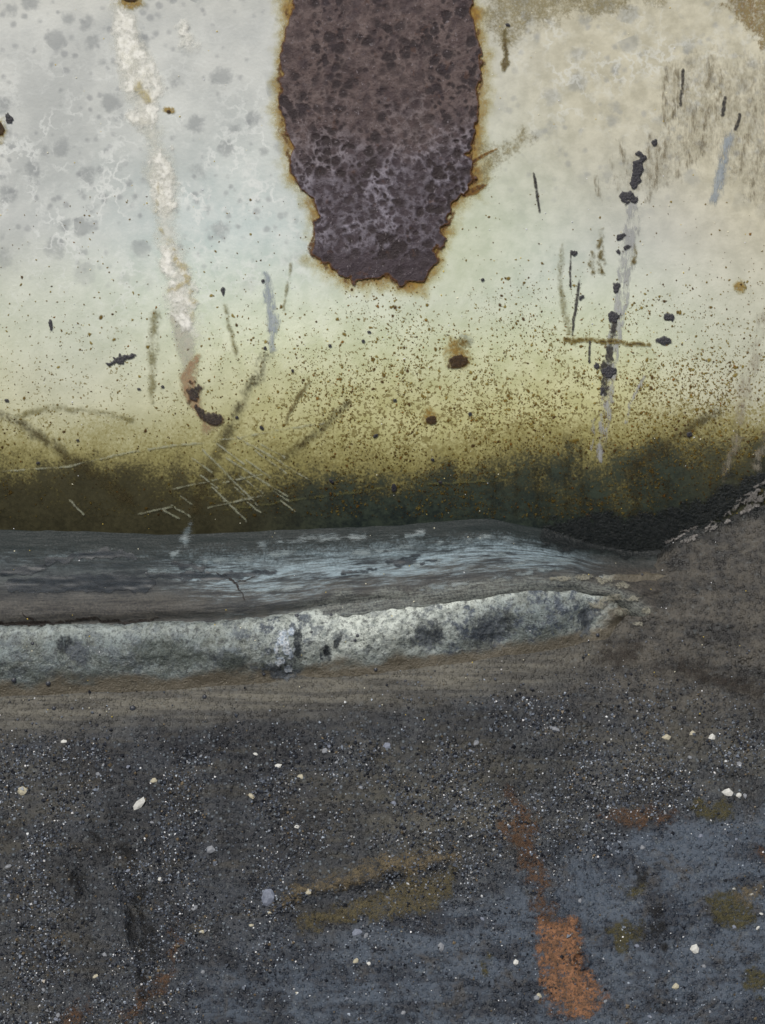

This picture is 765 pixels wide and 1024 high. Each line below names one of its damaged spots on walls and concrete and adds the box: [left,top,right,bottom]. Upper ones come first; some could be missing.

corrosion [53,0,765,518]
corrosion [0,355,156,518]
damp [170,403,242,556]
damp [320,534,390,556]